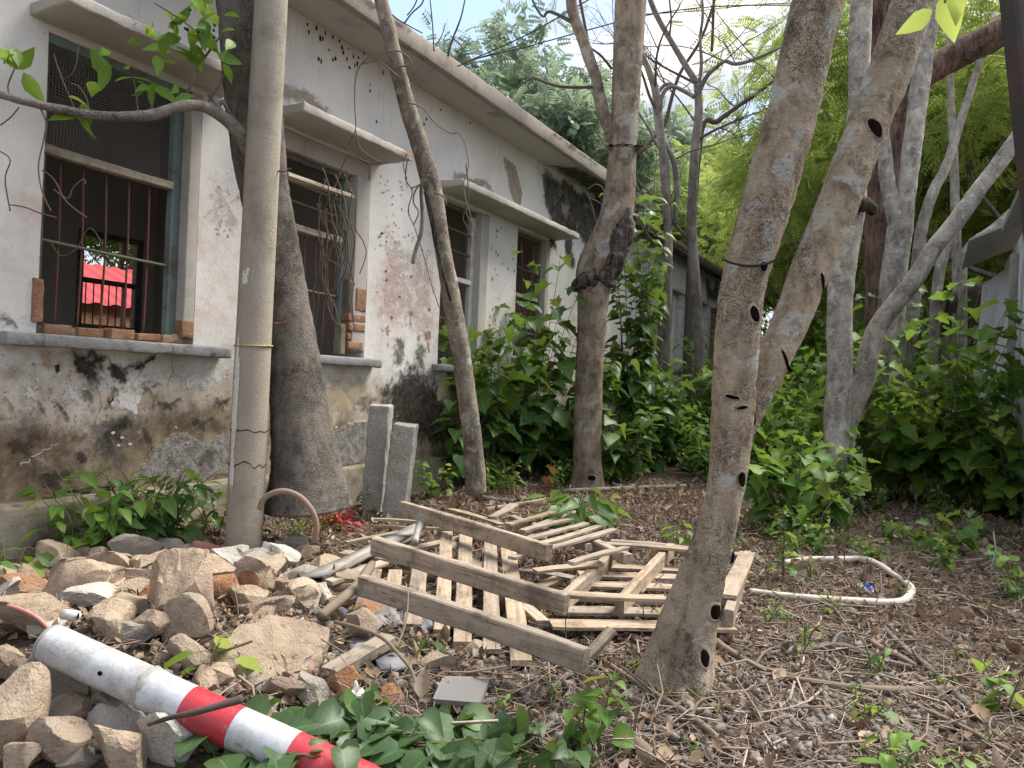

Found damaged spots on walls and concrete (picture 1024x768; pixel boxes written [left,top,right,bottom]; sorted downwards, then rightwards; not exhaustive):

peeling [503,157,522,205]
damp [542,166,605,269]
damp [72,350,155,402]
damp [326,338,459,450]
damp [0,425,87,495]
damp [91,416,141,466]
peeling [139,427,230,485]